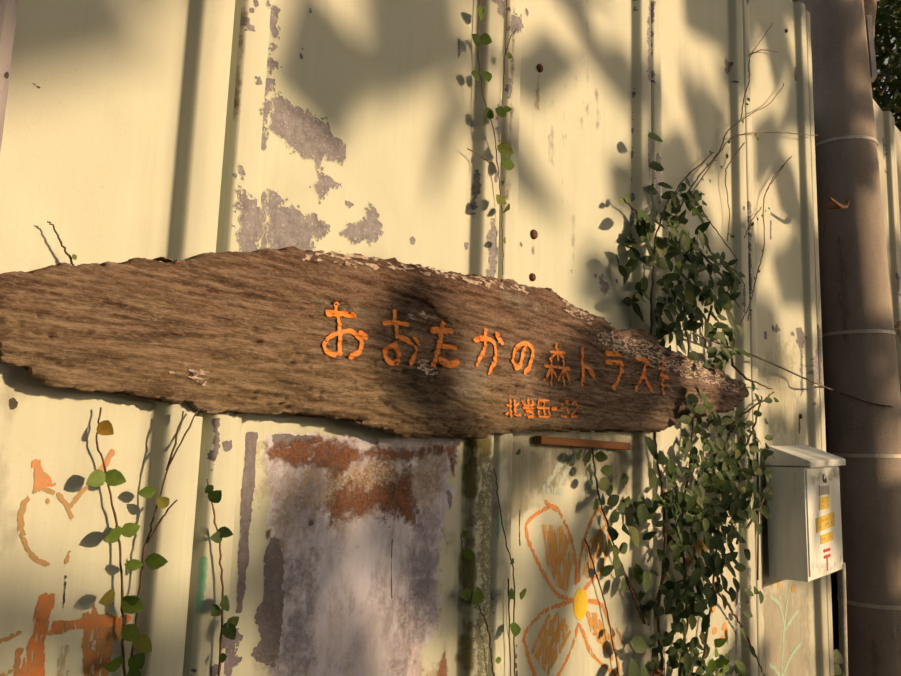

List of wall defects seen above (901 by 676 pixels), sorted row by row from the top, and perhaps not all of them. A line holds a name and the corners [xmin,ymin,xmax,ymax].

peeling [232,0,384,252]
peeling [207,418,232,471]
peeling [210,431,459,676]
corrosion [267,435,460,527]